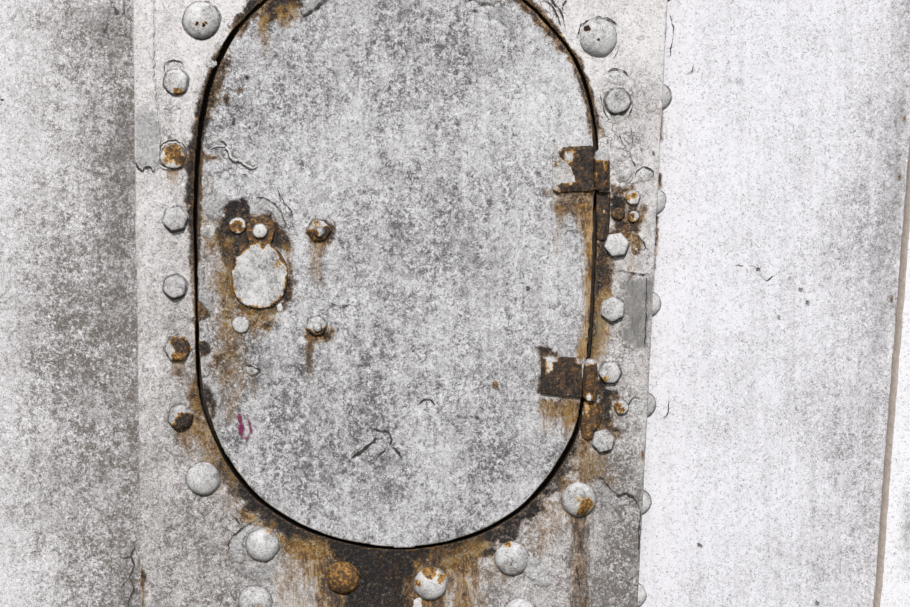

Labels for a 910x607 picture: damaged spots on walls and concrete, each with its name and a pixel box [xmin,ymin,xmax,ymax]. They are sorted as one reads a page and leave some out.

rust [228,0,270,37]
rust [170,49,293,383]
rust [304,328,334,371]
rust [309,219,336,251]
rust [543,184,659,360]
rust [175,346,621,607]